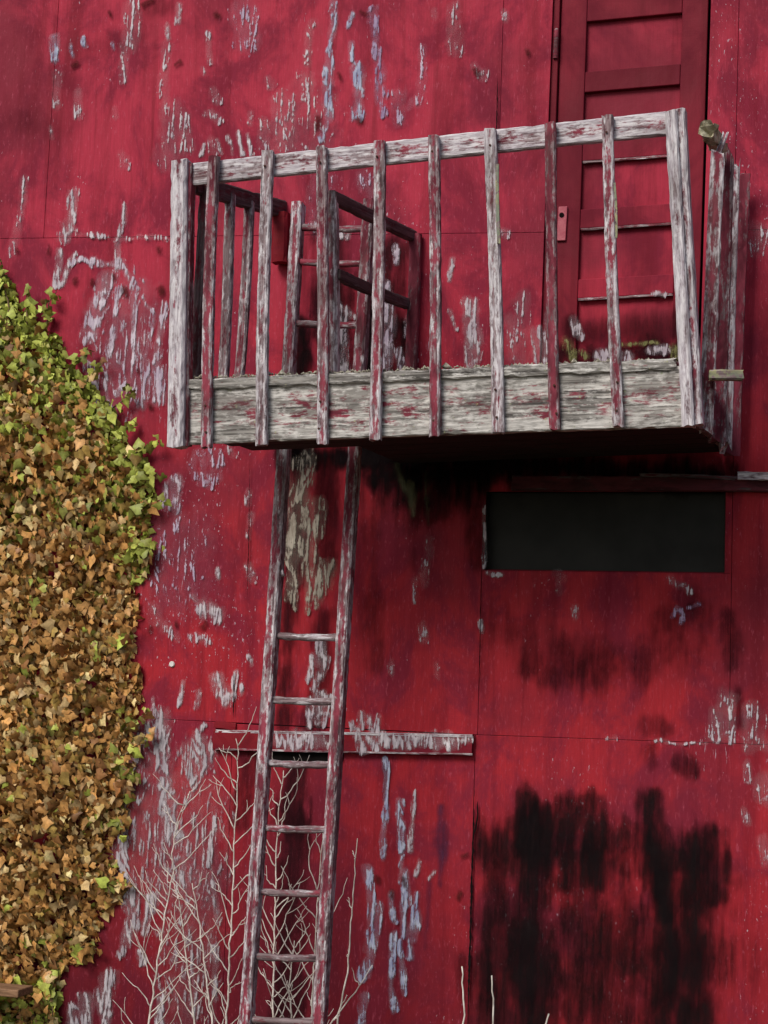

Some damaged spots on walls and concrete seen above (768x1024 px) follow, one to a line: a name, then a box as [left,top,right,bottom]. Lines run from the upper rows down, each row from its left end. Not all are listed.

peeling [50,35,88,78]
peeling [113,0,140,84]
peeling [157,1,354,167]
peeling [350,4,403,125]
peeling [52,189,169,422]
peeling [447,297,483,368]
peeling [284,449,334,616]
peeling [654,695,767,751]
peeling [68,671,244,1024]
peeling [349,710,473,1024]
leakage [478,788,731,1024]